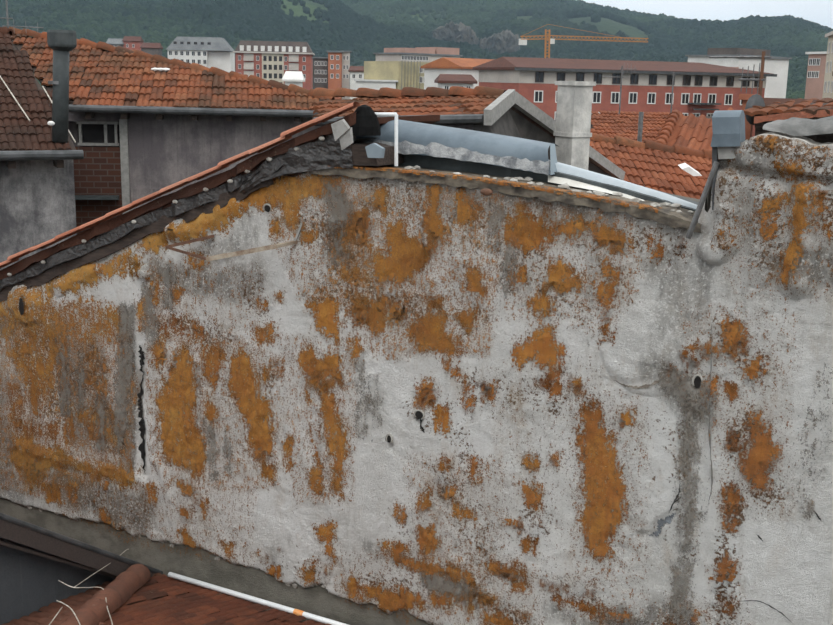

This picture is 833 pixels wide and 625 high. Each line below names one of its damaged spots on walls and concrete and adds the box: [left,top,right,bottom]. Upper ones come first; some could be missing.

crack [137,345,145,473]
damp [0,135,833,625]
crack [649,481,681,537]